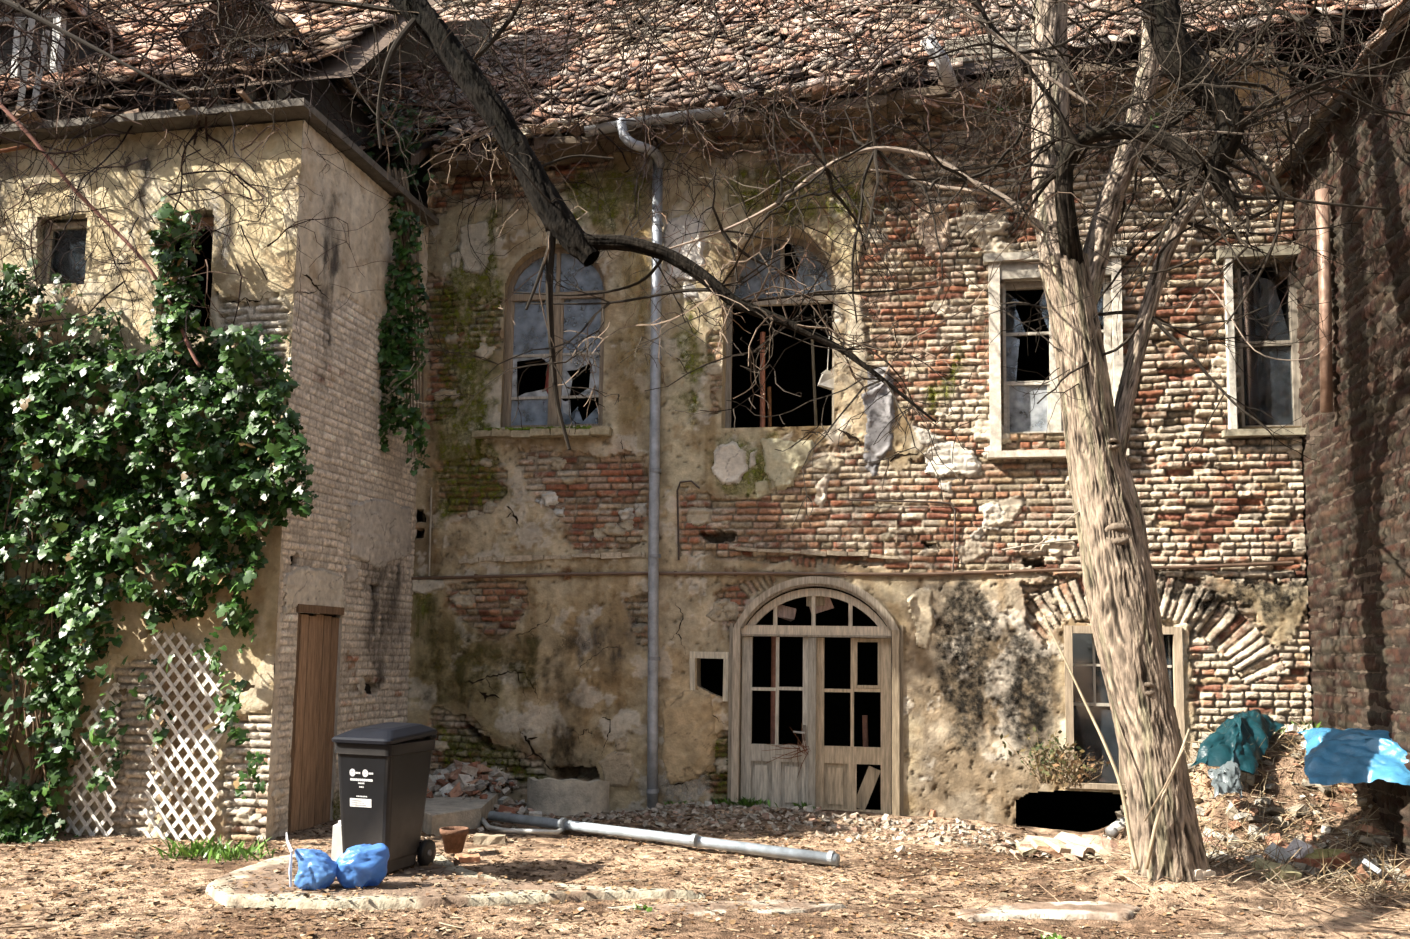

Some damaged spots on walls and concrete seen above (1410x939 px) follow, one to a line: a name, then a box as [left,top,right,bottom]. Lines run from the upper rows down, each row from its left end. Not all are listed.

spalling [429,143,530,217]
spalling [529,140,615,193]
spalling [1073,140,1120,249]
spalling [679,113,1090,649]
spalling [1104,128,1312,743]
spalling [216,220,529,842]
spalling [434,444,649,554]
damp [420,601,539,704]
spalling [624,592,648,650]
spalling [430,706,600,792]